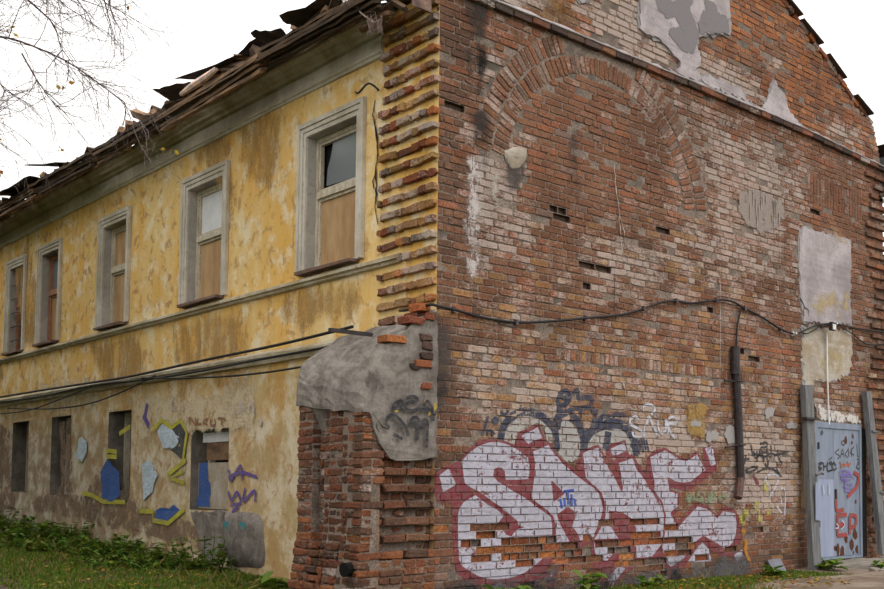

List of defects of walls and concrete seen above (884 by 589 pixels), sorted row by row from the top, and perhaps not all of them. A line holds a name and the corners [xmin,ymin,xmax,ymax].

leakage [466,2,488,94]
flaking render [636,0,803,126]
leakage [465,110,490,276]
flaking render [377,302,435,370]